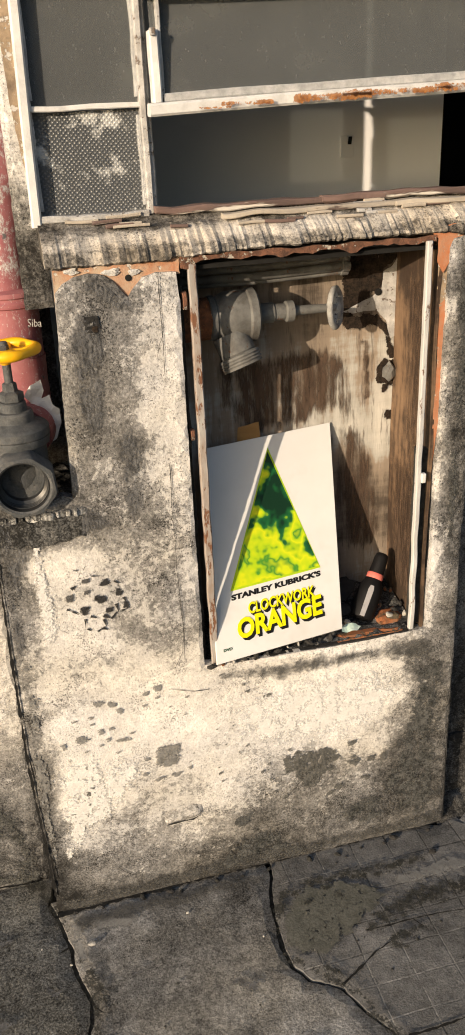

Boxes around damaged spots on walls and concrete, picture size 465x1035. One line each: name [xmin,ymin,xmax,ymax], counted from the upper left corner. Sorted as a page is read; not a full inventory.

flaking render [0,0,26,173]
corrosion [199,99,274,109]
corrosion [294,82,465,103]
water stain [71,320,104,432]
water stain [118,430,142,518]
crack [168,465,209,692]
crack [0,582,465,1035]
water stain [0,628,465,1035]